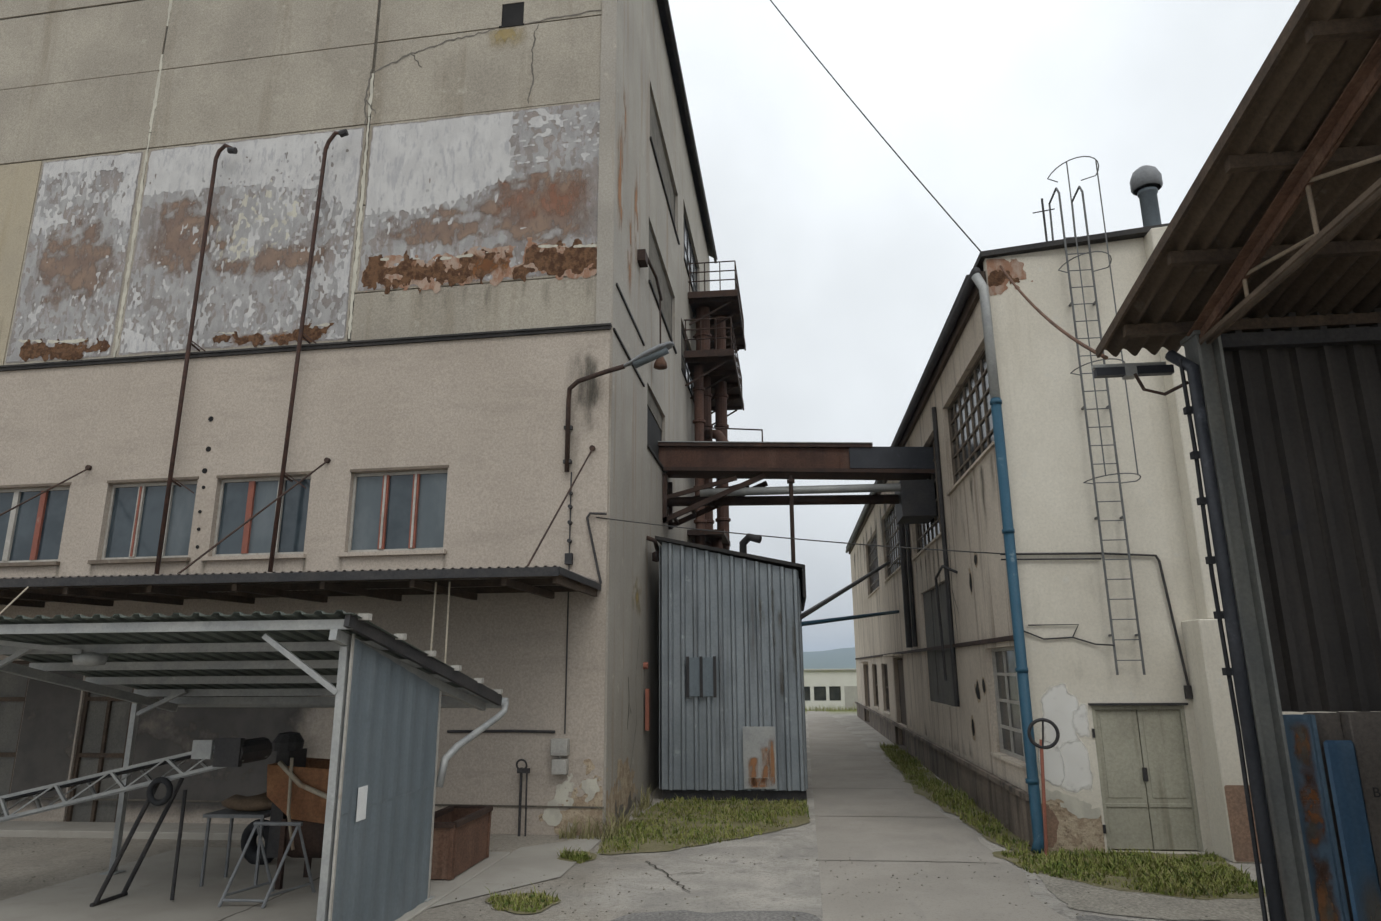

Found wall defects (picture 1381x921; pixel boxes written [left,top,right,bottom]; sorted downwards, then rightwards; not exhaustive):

crack [364,10,602,126]
peeling [6,101,600,363]
spalling [538,757,638,836]
spalling [1040,789,1105,852]